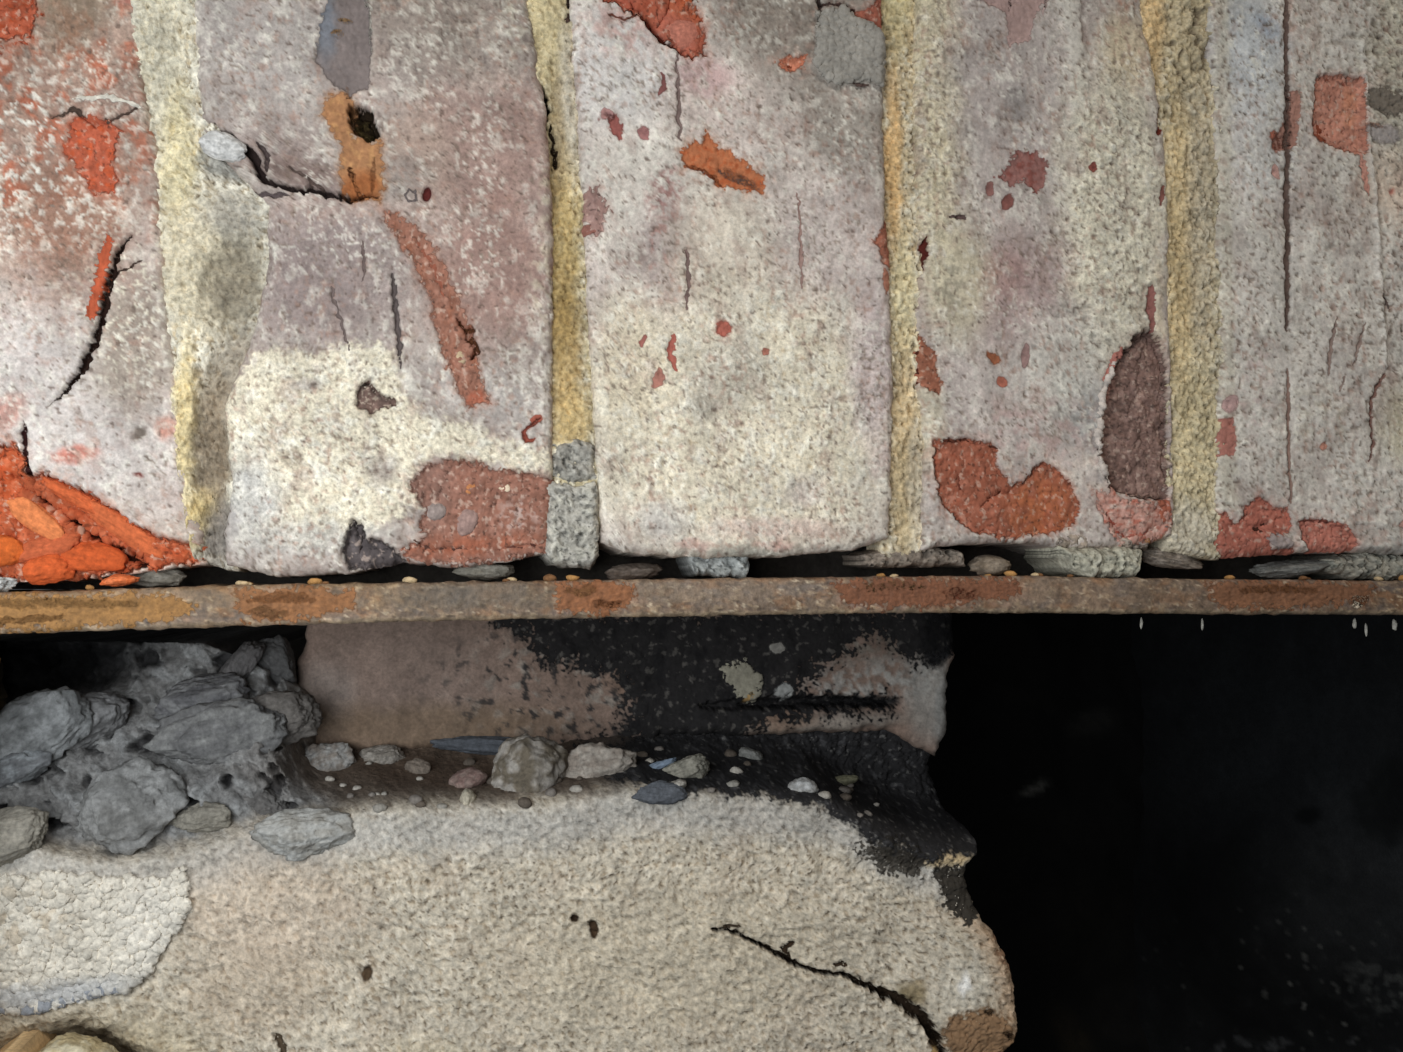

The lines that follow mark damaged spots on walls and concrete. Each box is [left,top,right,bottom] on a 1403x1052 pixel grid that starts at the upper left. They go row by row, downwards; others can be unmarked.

spalling [603,0,706,60]
crack [214,123,378,204]
crack [1282,0,1291,331]
crack [21,234,142,477]
spalling [932,332,1173,547]
spalling [0,441,208,585]
spalling [342,459,554,571]
corrosion [0,589,199,634]
corrosion [233,584,358,625]
corrosion [552,579,638,619]
corrosion [830,576,1022,613]
crack [711,924,945,1052]